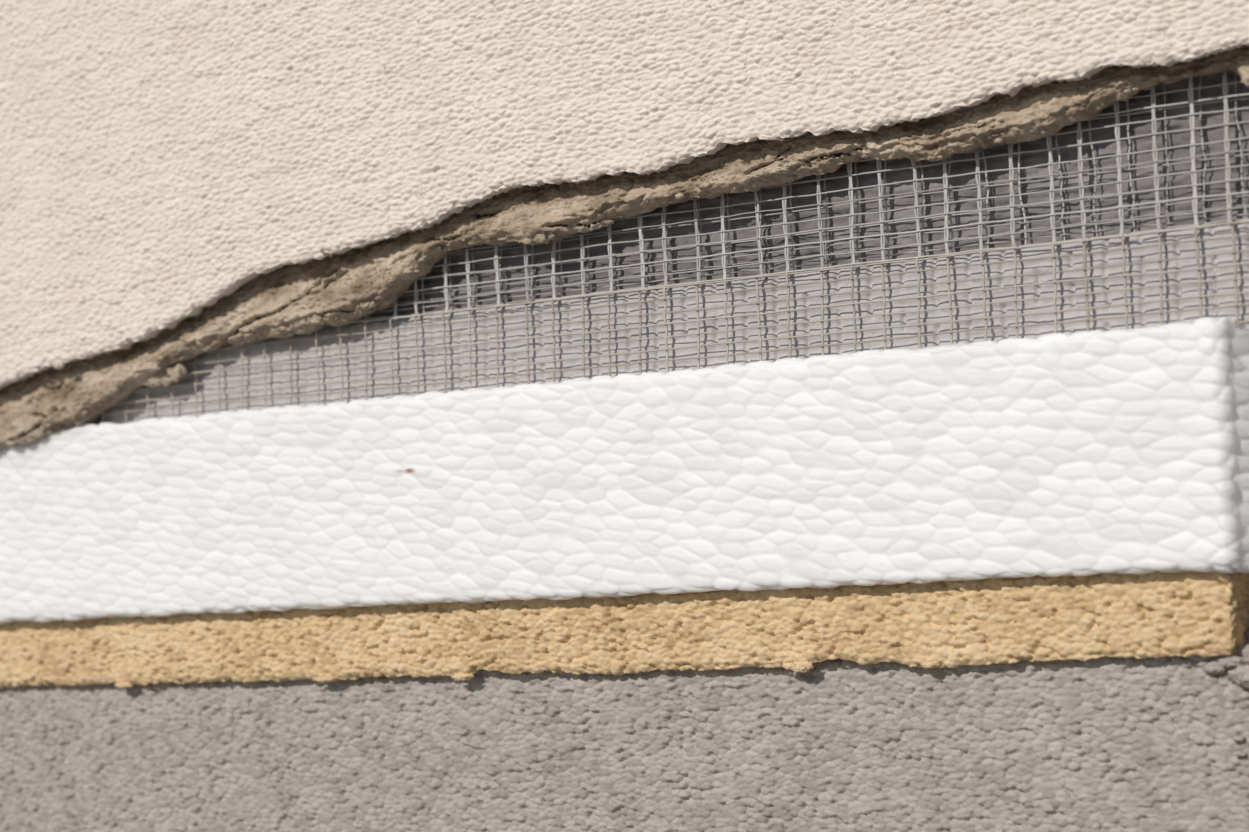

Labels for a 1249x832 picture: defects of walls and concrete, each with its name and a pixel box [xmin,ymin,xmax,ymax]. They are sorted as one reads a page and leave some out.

spalling [0,45,1249,448]